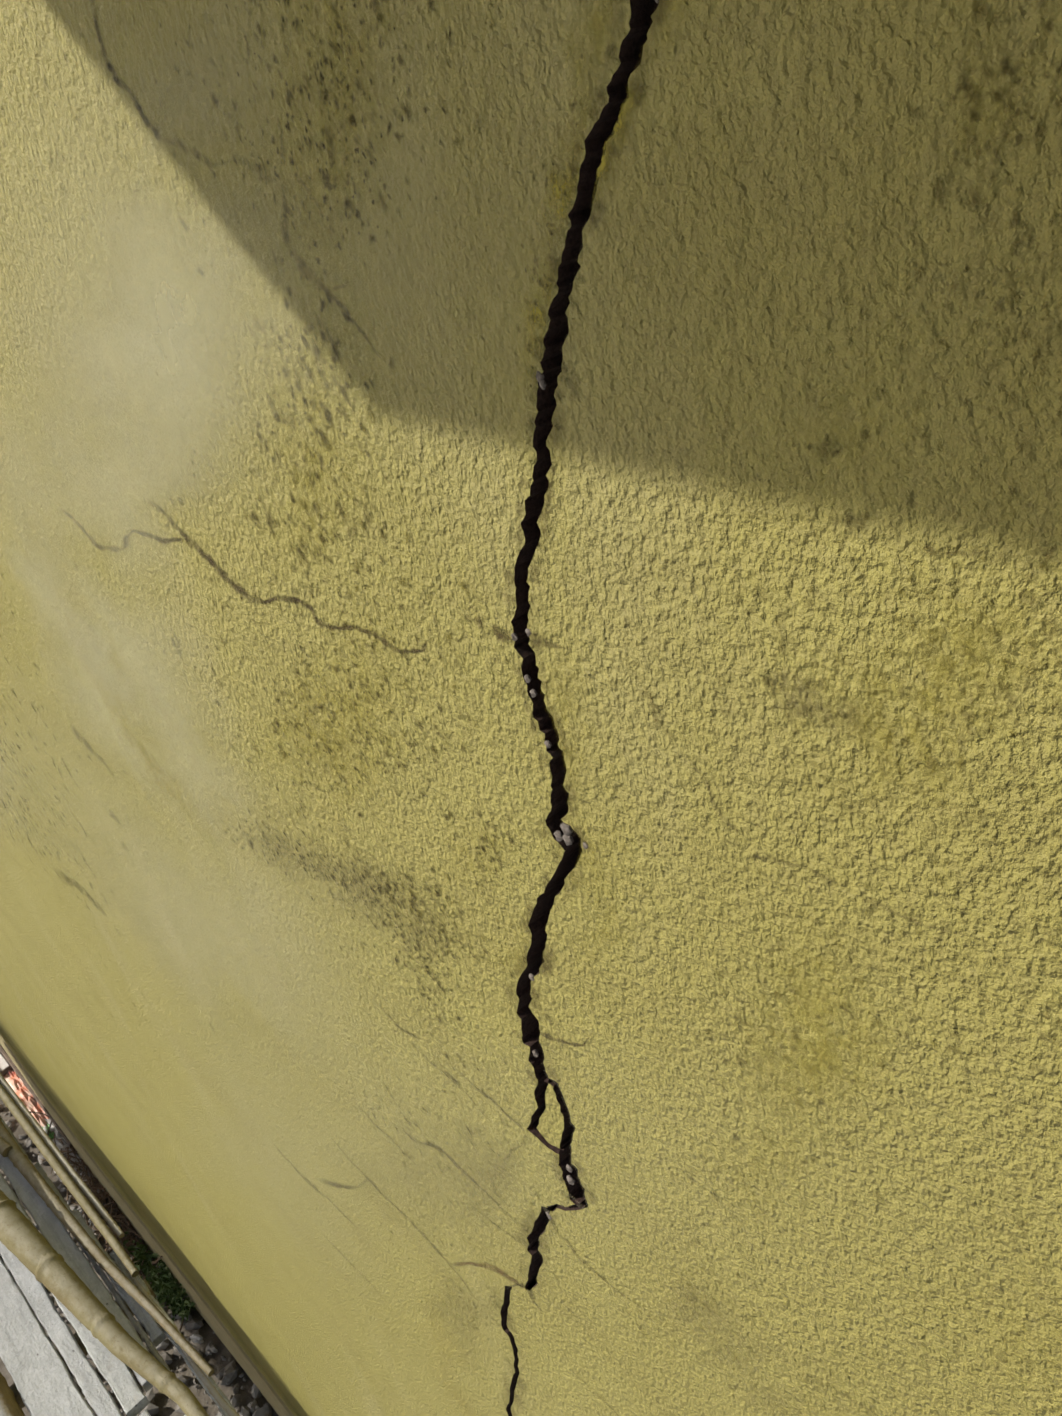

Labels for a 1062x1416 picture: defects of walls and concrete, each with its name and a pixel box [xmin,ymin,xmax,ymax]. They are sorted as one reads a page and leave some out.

crack [69,509,424,654]
crack [459,0,659,1416]